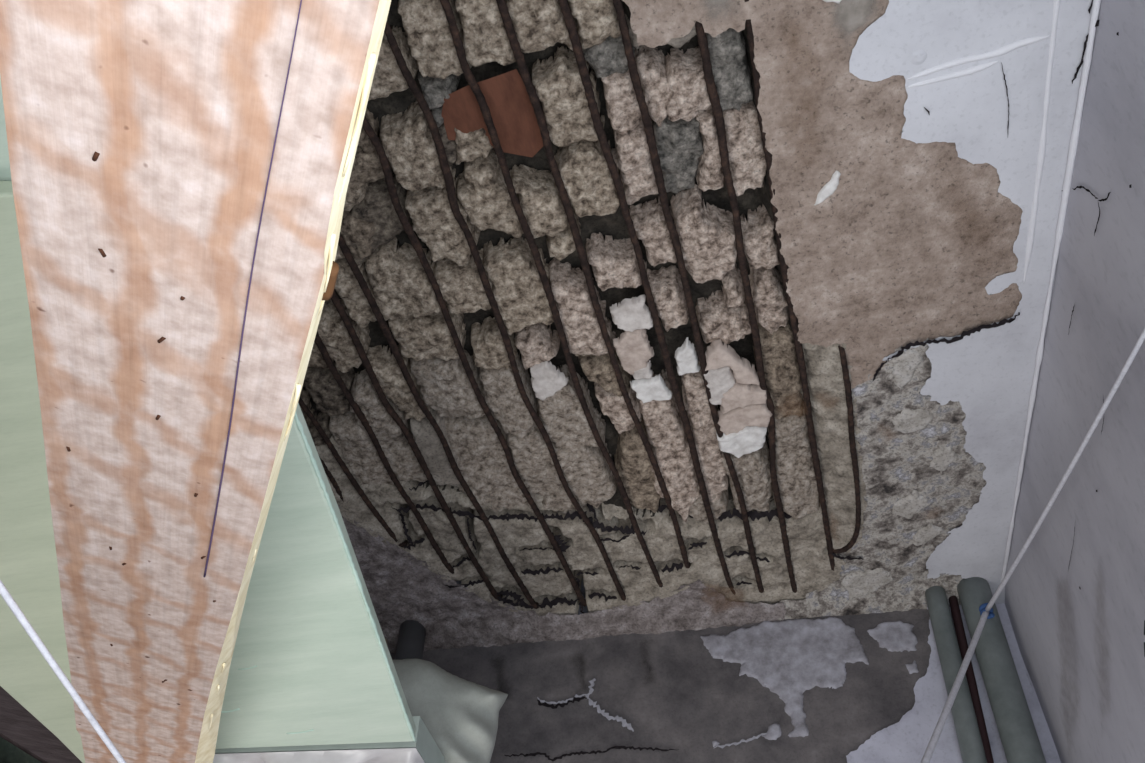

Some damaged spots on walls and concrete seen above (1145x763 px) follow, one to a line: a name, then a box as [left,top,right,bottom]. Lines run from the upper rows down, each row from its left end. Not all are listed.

spalling [298,0,1023,654]
crack [873,312,1020,381]
crack [505,678,679,761]
leakage [422,609,931,763]